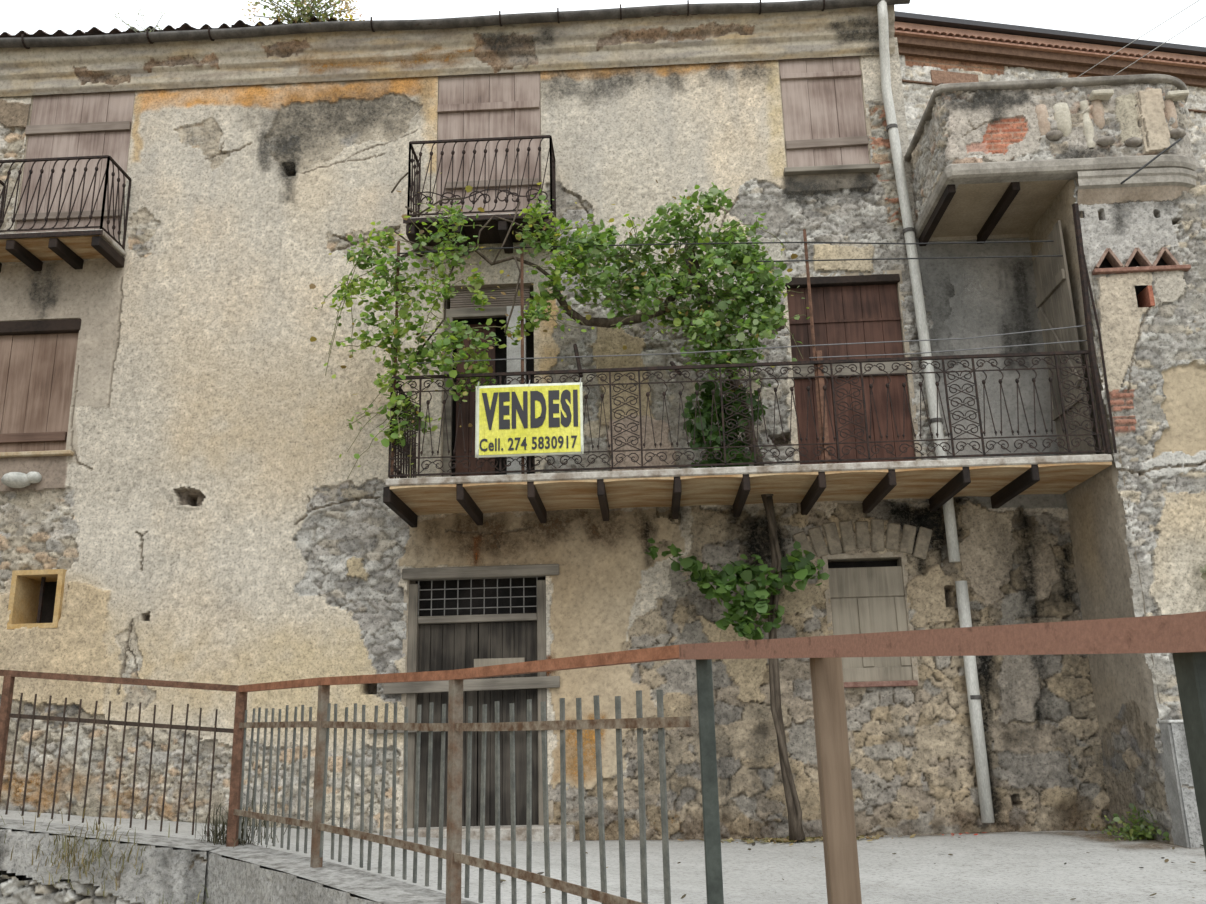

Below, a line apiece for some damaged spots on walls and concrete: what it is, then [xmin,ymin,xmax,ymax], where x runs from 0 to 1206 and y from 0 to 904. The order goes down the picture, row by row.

water stain [260,96,391,200]
crack [302,129,418,174]
spalling [543,100,951,473]
flaking render [1097,270,1187,434]
spalling [175,486,206,506]
flaking render [0,694,403,833]
spalling [293,477,412,703]
flaking render [548,497,1082,841]
water stain [977,655,1028,832]
flaking render [844,654,1175,844]
water stain [1020,513,1039,623]
water stain [1060,546,1072,602]